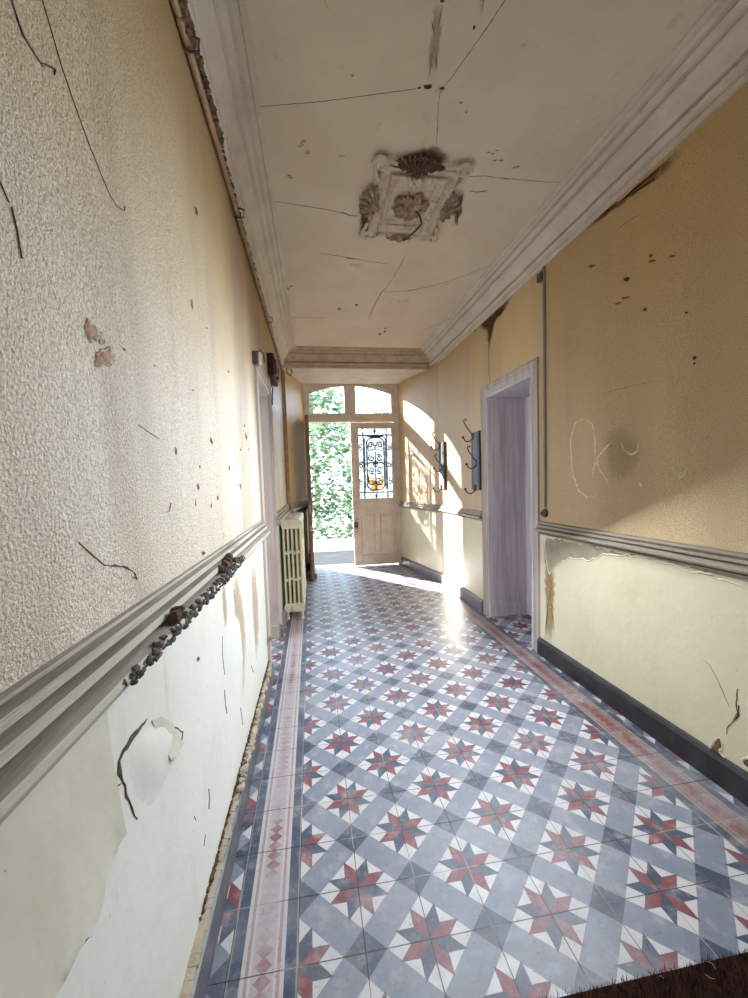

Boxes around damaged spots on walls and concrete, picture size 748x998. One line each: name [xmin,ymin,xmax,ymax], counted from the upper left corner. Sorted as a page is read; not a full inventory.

spalling [189,19,224,146]
crack [261,89,412,107]
crack [436,0,505,149]
crack [469,176,544,194]
crack [322,253,490,321]
peeling [544,537,748,593]
spalling [122,553,245,691]
peeling [152,717,184,760]
crack [707,663,740,753]
peeling [0,710,127,998]